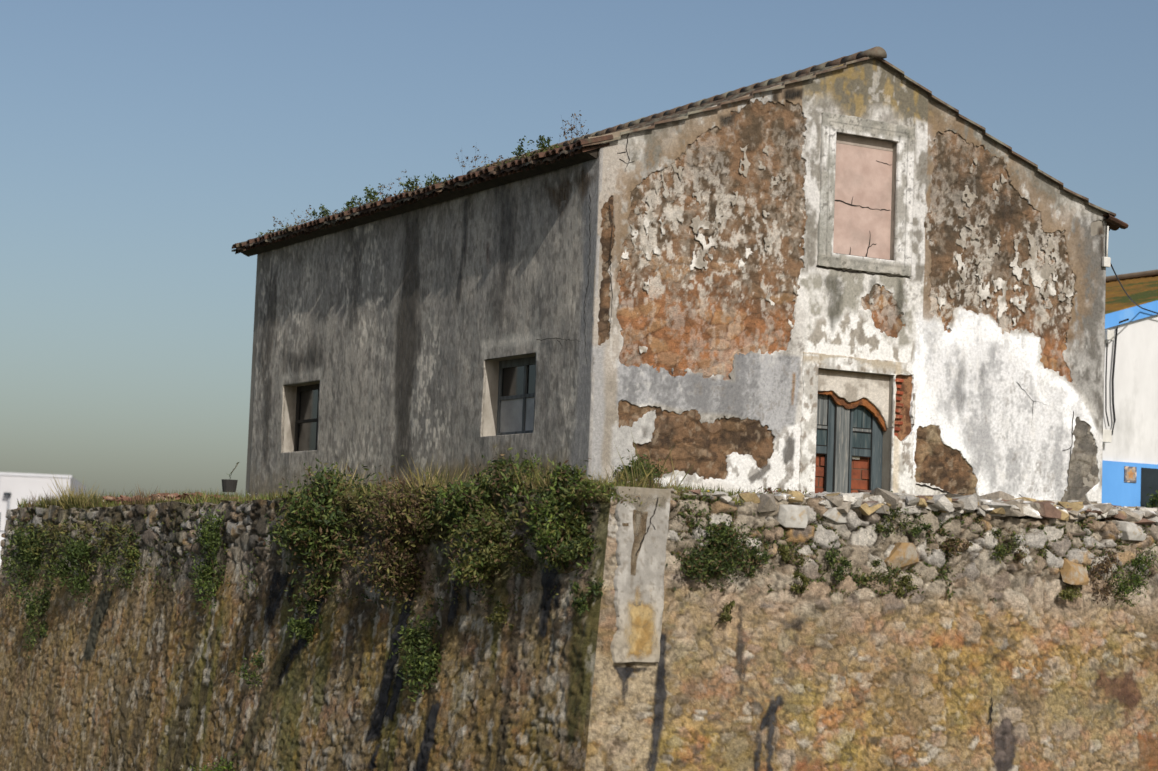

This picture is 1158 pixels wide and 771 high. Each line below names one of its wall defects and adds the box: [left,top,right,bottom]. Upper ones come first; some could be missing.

water stain [393,216,419,471]
spalling [597,96,808,381]
spalling [861,284,905,338]
spalling [924,130,1077,382]
spalling [618,399,774,480]
spalling [818,375,978,495]
spalling [1061,417,1099,502]
water stain [238,570,330,771]
water stain [366,593,415,771]
water stain [413,702,441,771]
water stain [615,633,667,771]
water stain [754,694,783,771]